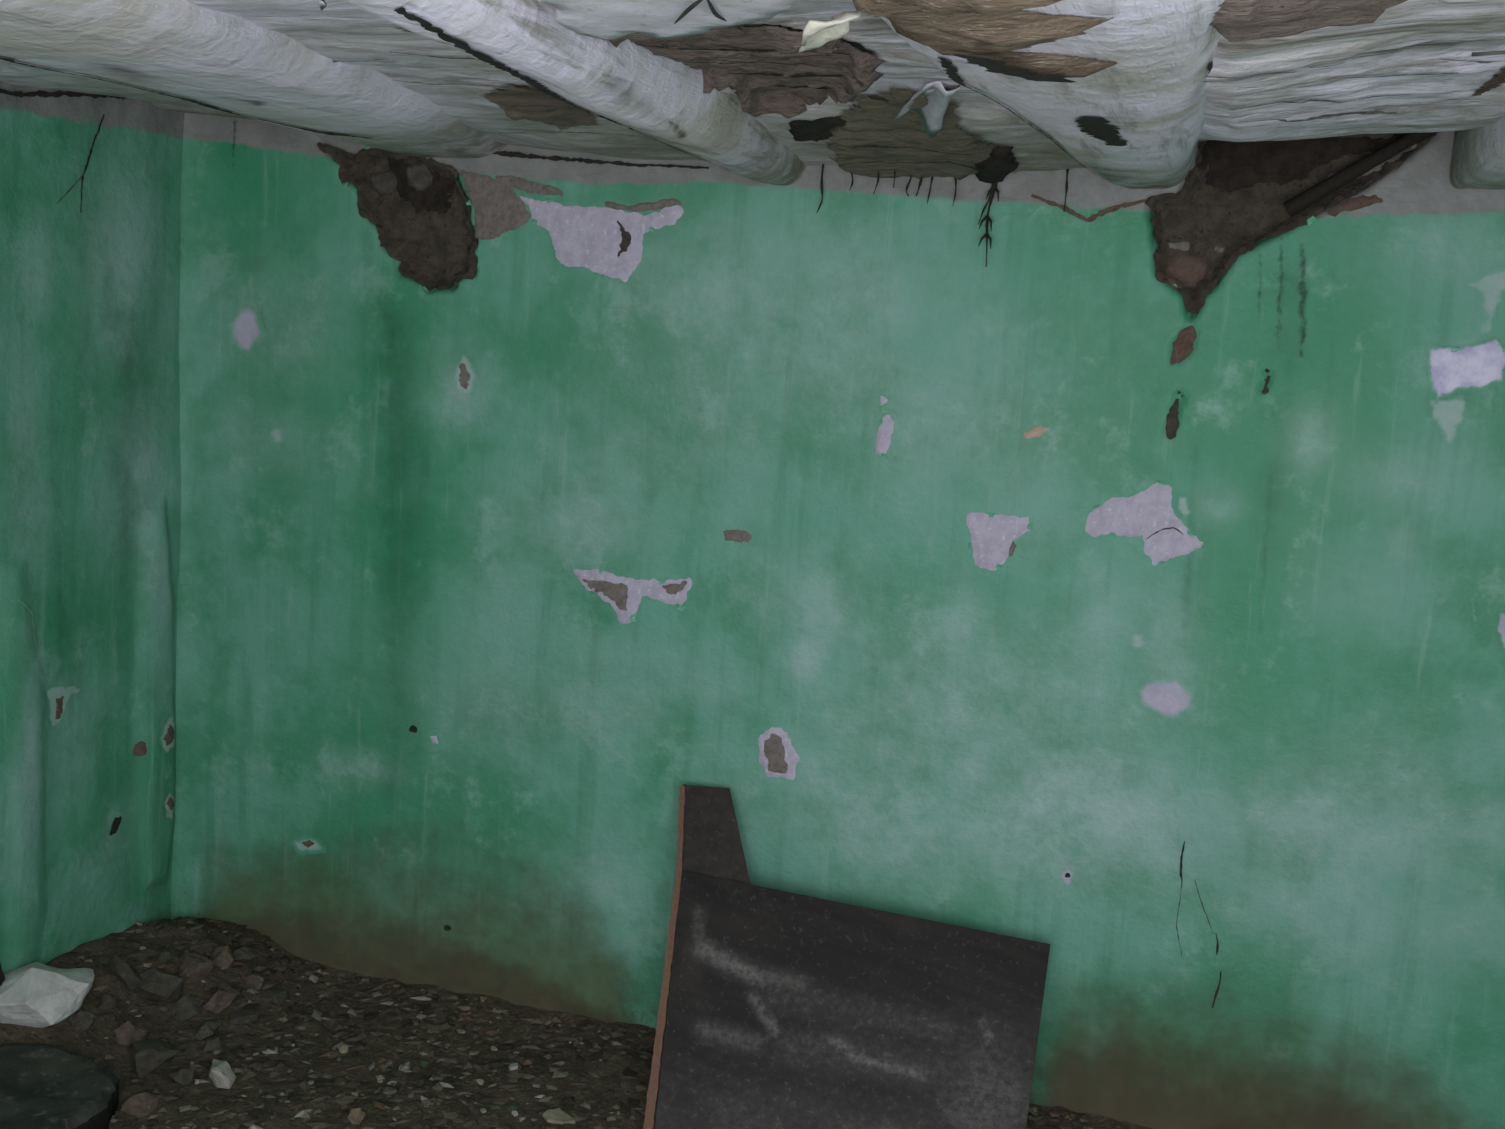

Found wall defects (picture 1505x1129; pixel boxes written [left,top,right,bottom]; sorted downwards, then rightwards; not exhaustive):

crack [0,57,369,213]
crack [333,7,731,173]
peeling [538,0,797,40]
peeling [799,10,861,53]
spalling [317,142,684,292]
spalling [1031,133,1436,365]
peeling [1425,265,1505,456]
peeling [573,569,692,624]
peeling [966,512,1033,571]
peeling [1085,479,1204,566]
leakage [208,865,621,1023]
leakage [1047,1015,1444,1129]